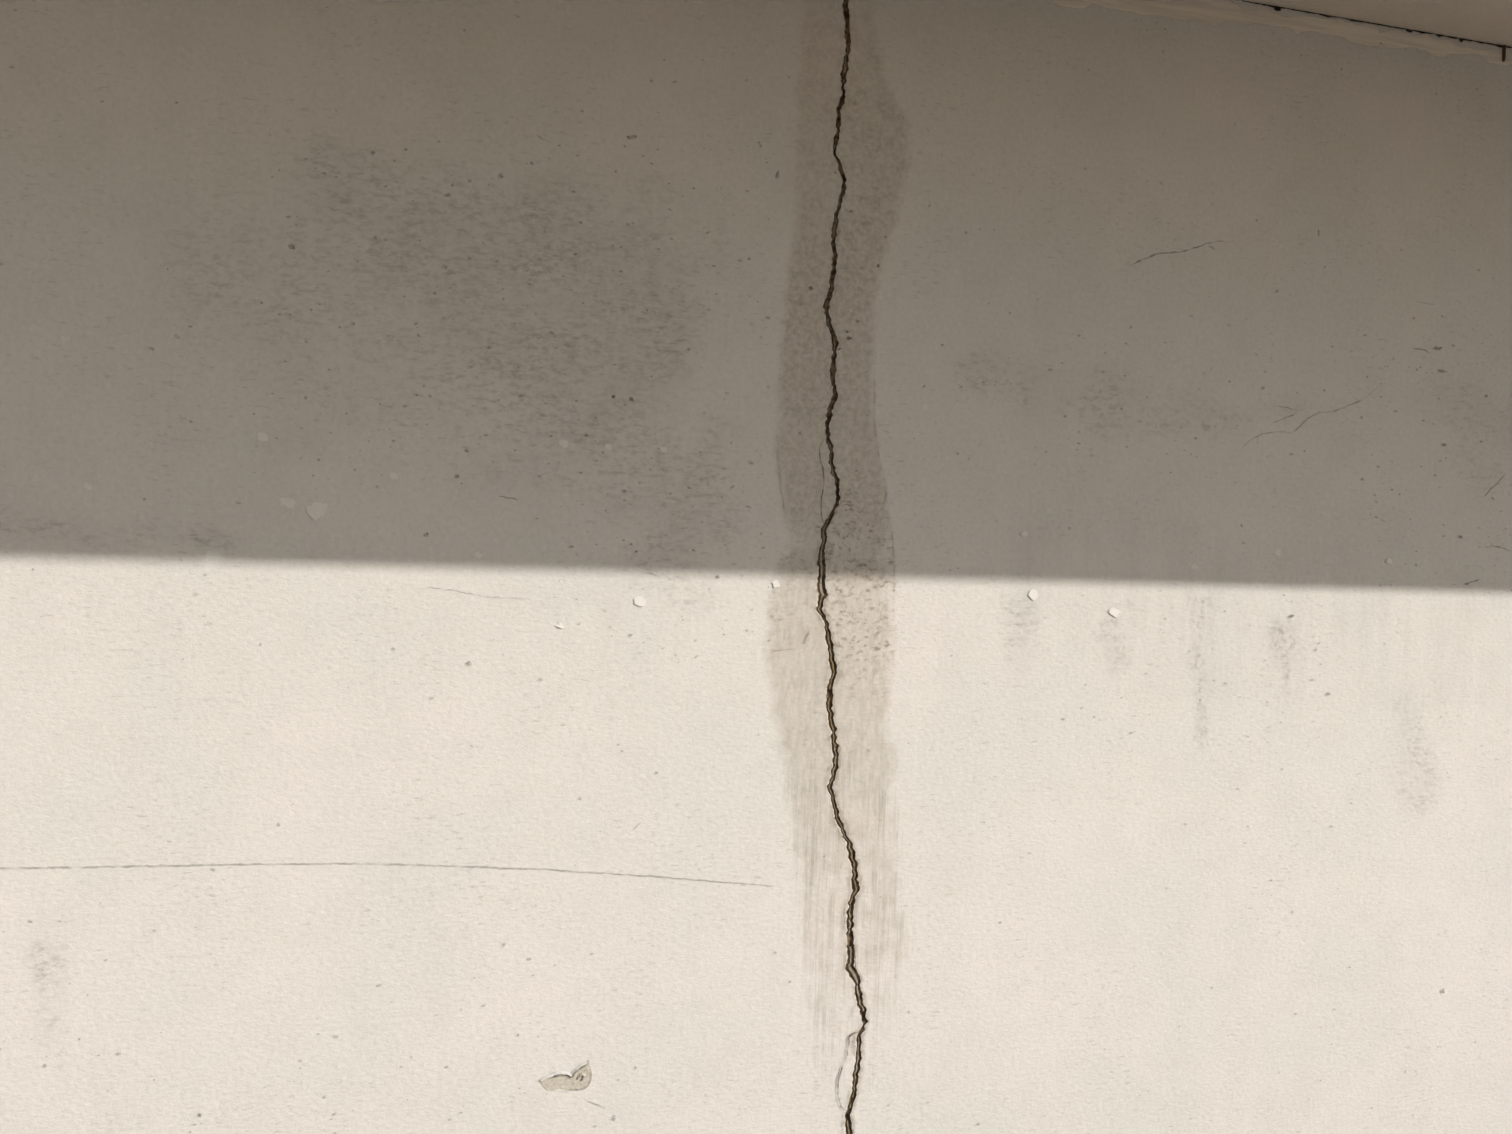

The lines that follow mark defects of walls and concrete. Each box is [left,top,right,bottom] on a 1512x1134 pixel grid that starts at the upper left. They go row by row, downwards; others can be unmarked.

crack [1241,0,1512,48]
crack [816,0,868,1134]
peeling [539,1060,592,1091]